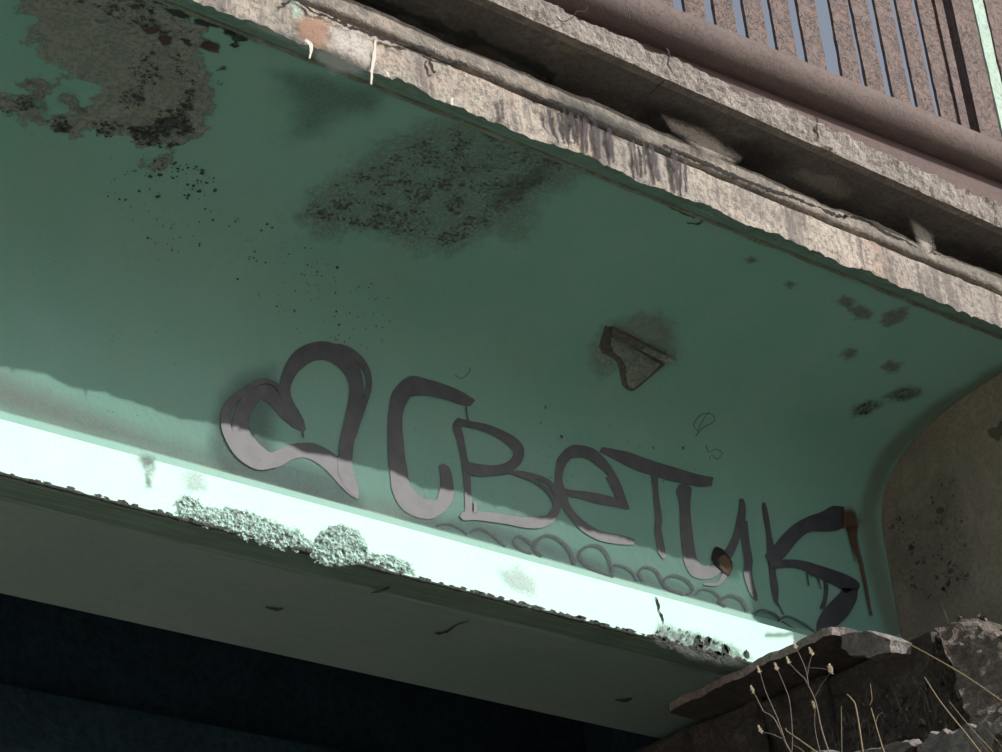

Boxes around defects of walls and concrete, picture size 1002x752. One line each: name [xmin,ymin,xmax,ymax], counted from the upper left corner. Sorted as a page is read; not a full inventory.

peeling [0,0,222,200]
leakage [546,98,660,182]
spalling [594,314,677,391]
spalling [0,471,256,540]
spalling [275,538,314,555]
corrosion [842,509,873,616]
spalling [350,561,752,665]